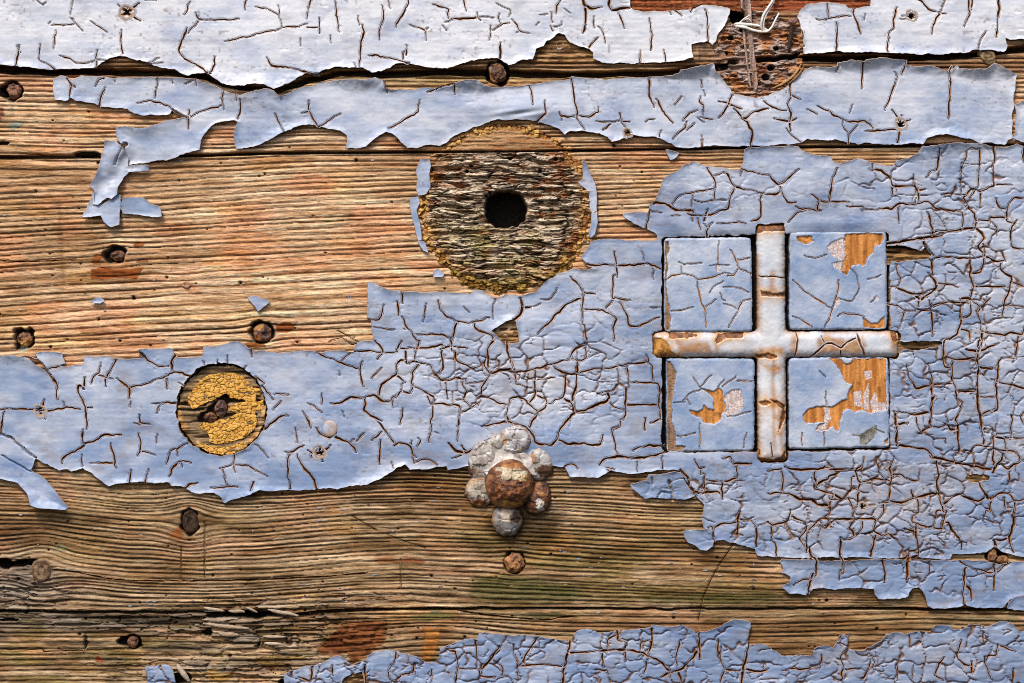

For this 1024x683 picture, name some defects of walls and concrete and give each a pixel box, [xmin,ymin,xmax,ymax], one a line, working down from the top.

crack [14,0,133,108]
crack [138,0,629,132]
peeling [0,0,1024,227]
crack [528,0,1002,147]
corrosion [757,225,785,234]
peeling [0,142,1024,611]
crack [0,147,1024,683]
corrosion [653,332,743,357]
corrosion [759,399,785,429]
corrosion [755,337,796,371]
peeling [145,663,176,683]
peeling [284,619,1024,683]